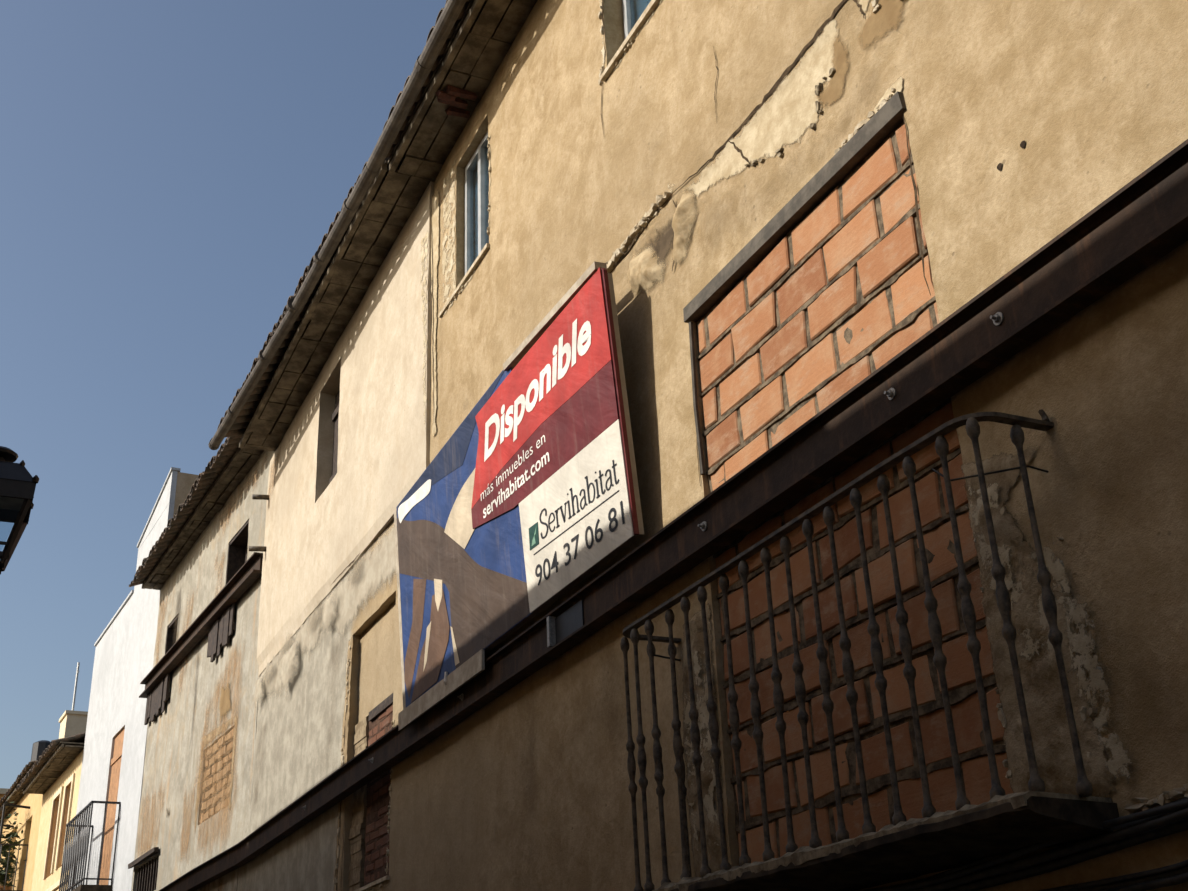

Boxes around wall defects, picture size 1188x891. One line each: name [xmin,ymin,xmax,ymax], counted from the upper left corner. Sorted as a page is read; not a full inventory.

spalling [598,0,662,86]
peeling [606,20,838,273]
crack [608,0,864,273]
spalling [834,77,902,154]
peeling [961,447,1131,797]